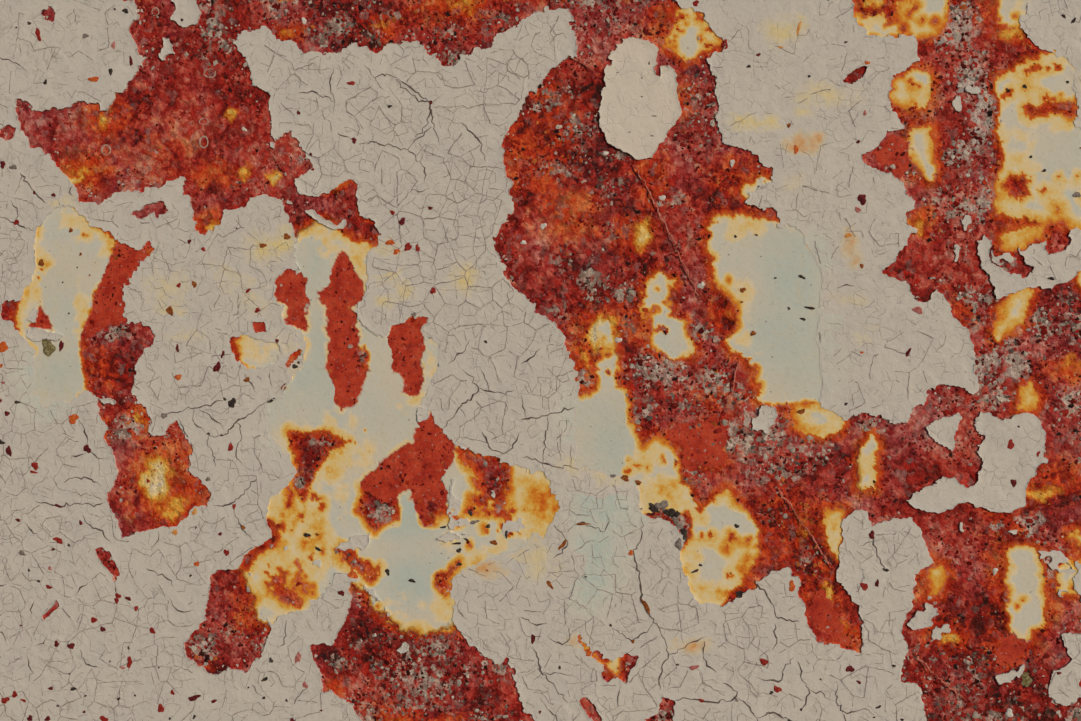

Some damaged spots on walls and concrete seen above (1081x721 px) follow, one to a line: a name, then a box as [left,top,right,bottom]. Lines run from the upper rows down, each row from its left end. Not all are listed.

peeling [0,0,676,721]
rust [385,239,420,255]
crack [242,15,923,721]
peeling [492,0,1081,721]
crack [729,2,973,416]
rust [855,194,866,213]